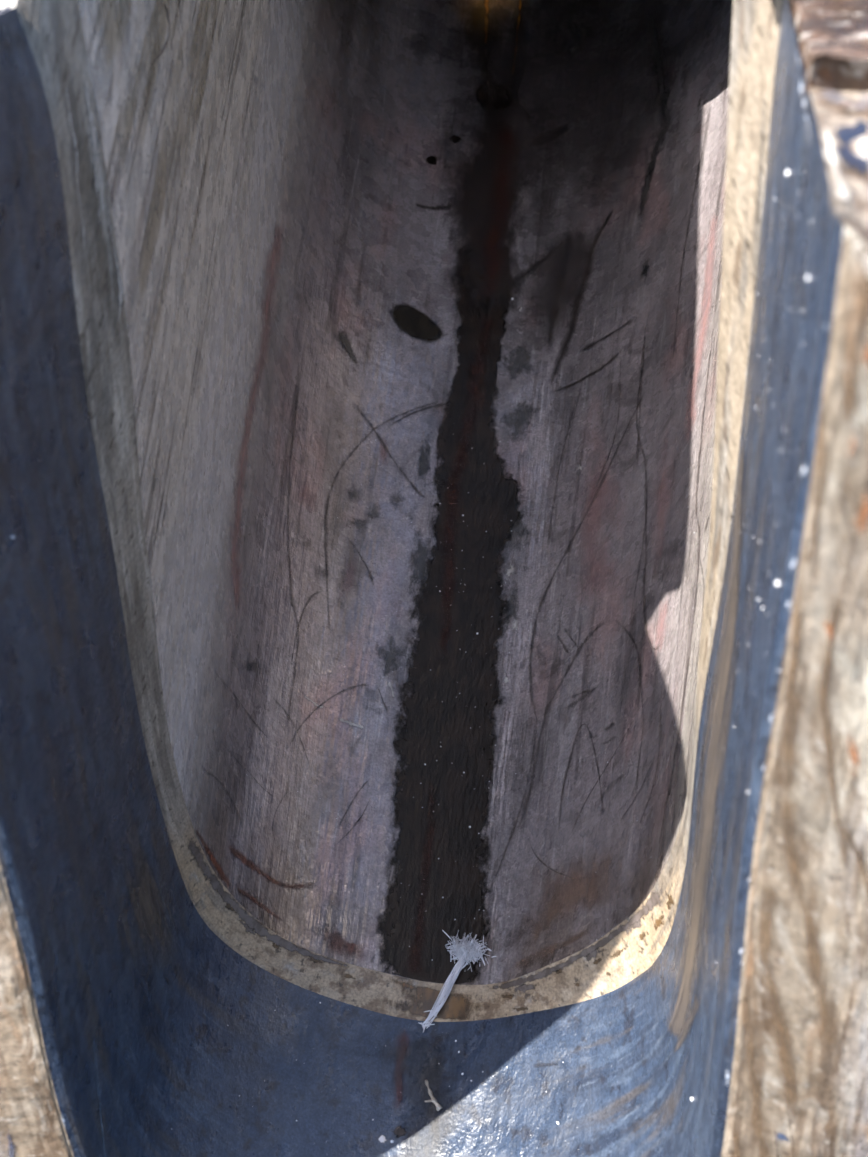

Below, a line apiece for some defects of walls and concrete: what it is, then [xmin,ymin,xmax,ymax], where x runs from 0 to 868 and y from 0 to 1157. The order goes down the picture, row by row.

leakage [640,14,671,214]
spalling [799,80,851,200]
spalling [842,225,868,274]
leakage [377,202,619,984]